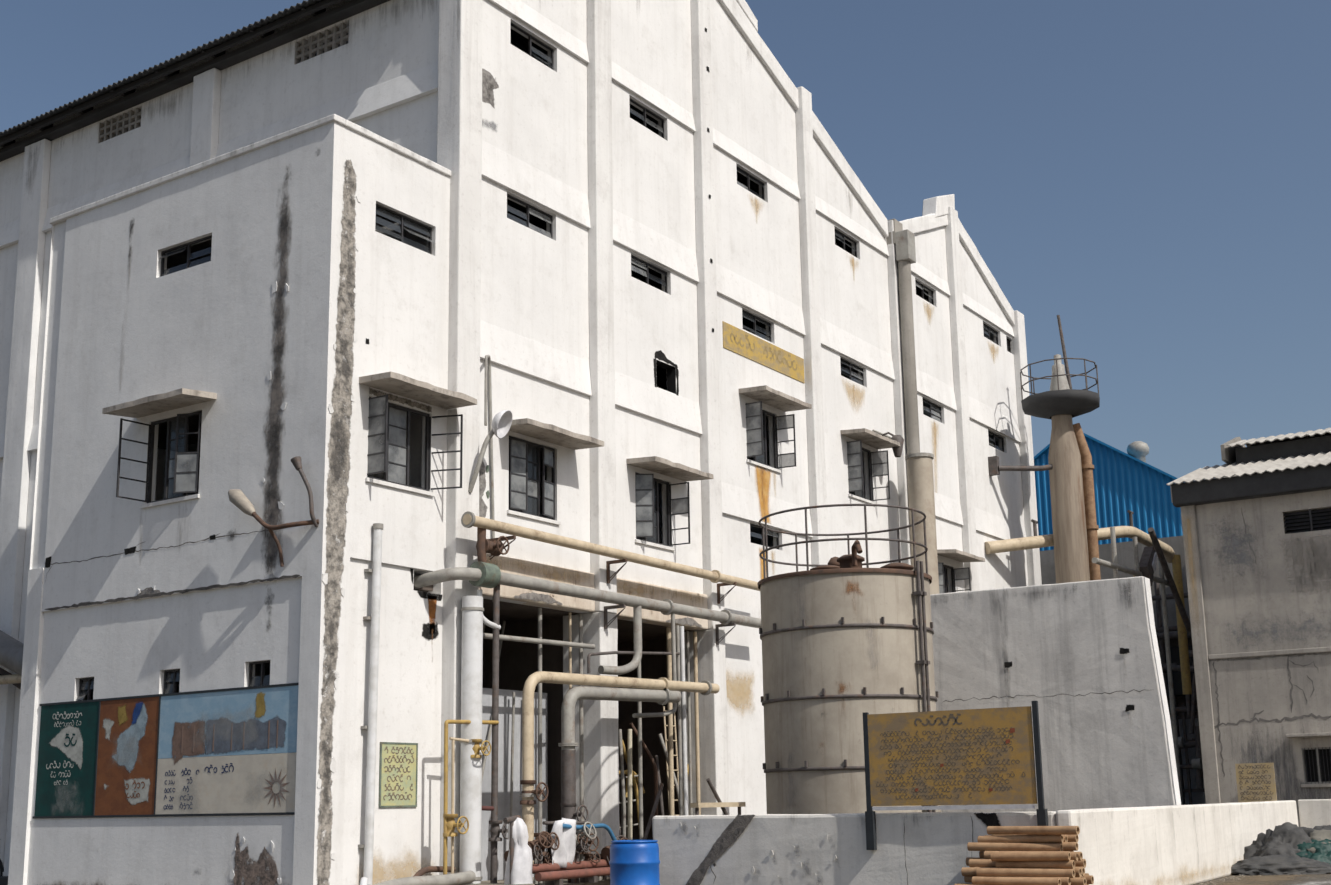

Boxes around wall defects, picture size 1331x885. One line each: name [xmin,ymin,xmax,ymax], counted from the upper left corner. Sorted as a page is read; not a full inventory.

spalling [482,69,499,108]
peeling [317,160,431,885]
rust [756,467,770,523]
crack [1212,656,1331,776]
flaking render [229,833,282,885]